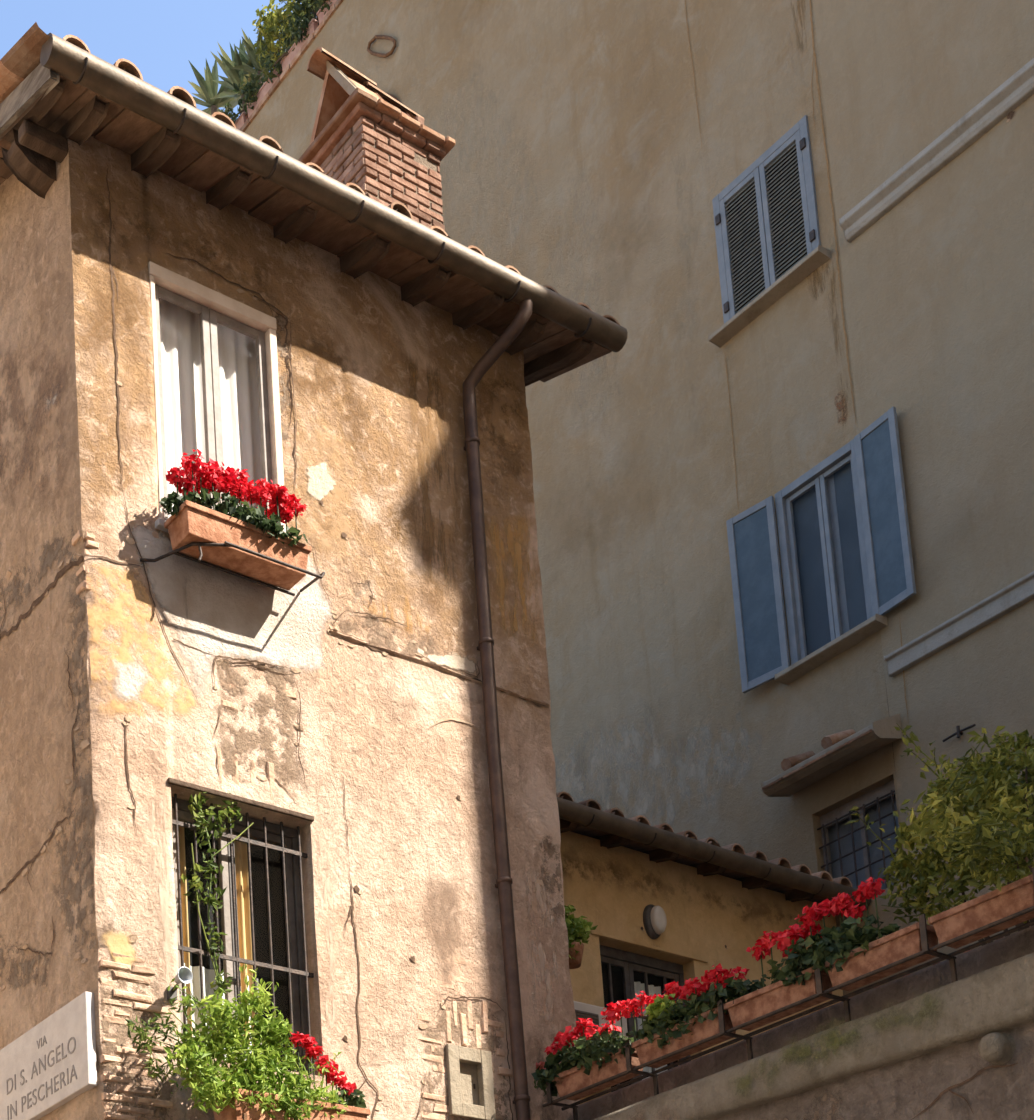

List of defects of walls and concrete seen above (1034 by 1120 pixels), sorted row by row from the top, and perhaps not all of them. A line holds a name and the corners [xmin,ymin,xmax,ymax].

crack [809,0,856,424]
crack [0,168,213,701]
crack [168,253,297,480]
crack [0,808,75,893]
crack [71,700,79,776]
flaking render [0,529,173,1120]
peeling [124,527,480,800]
crack [342,769,384,1120]
damp [431,886,458,971]
peeling [416,996,513,1120]